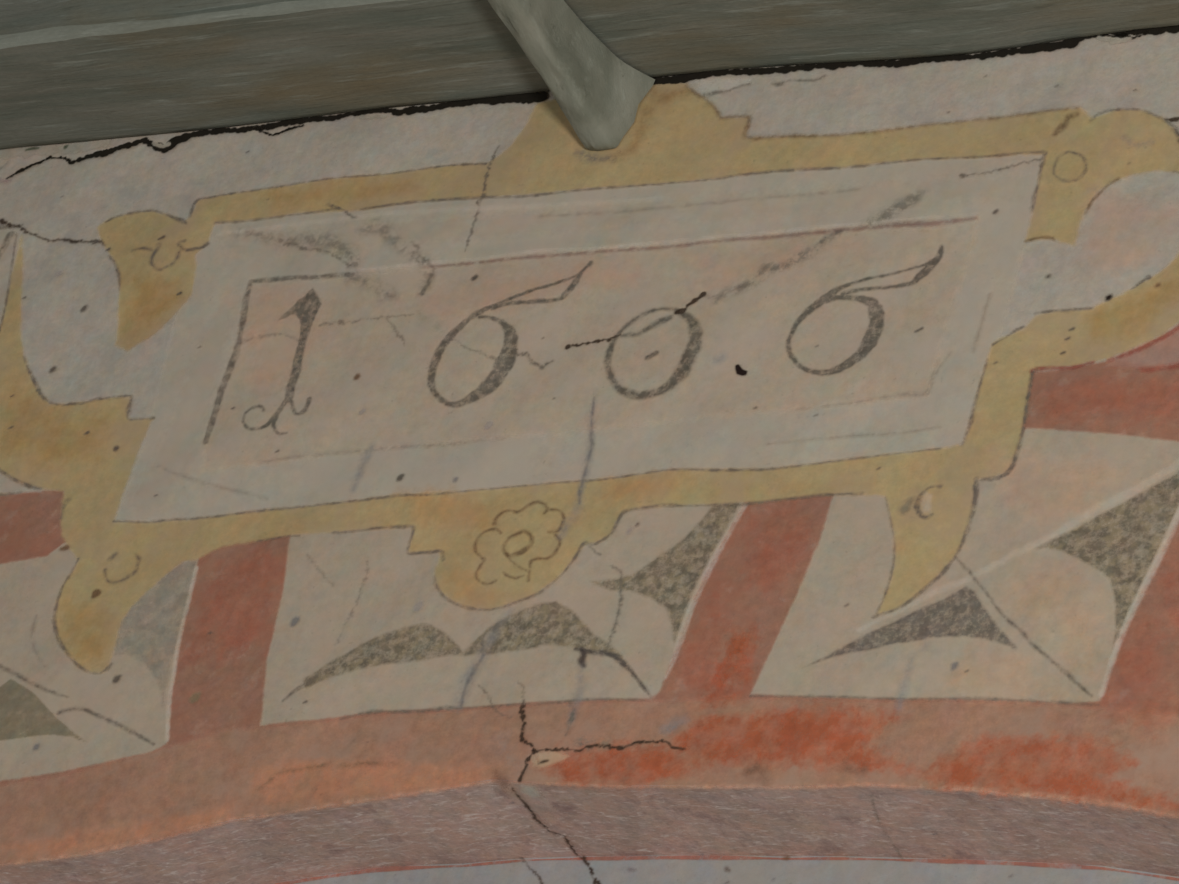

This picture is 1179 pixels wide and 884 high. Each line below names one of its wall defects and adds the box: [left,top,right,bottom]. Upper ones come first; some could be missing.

crack [652,25,1179,85]
crack [0,219,102,243]
crack [512,704,685,884]